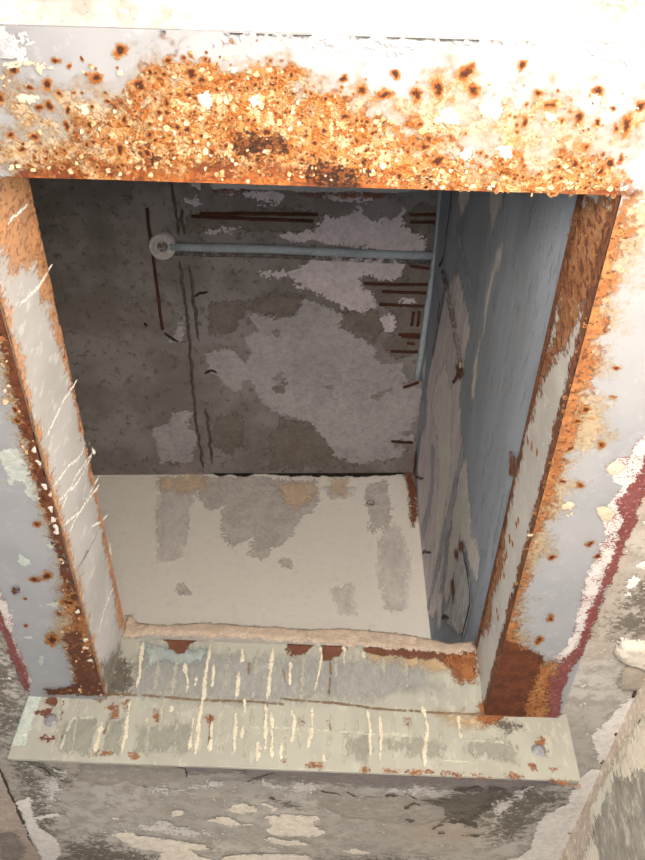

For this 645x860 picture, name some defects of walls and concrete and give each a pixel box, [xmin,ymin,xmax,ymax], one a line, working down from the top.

peeling [0,26,54,87]
rust [112,43,129,69]
peeling [113,56,437,570]
rust [0,50,645,734]
peeling [0,440,52,504]
leakage [157,474,208,561]
leakage [379,527,409,611]
peeling [553,434,645,662]
leakage [39,768,73,809]
rust [382,767,492,780]
leakage [97,817,214,841]
peeling [111,802,329,860]